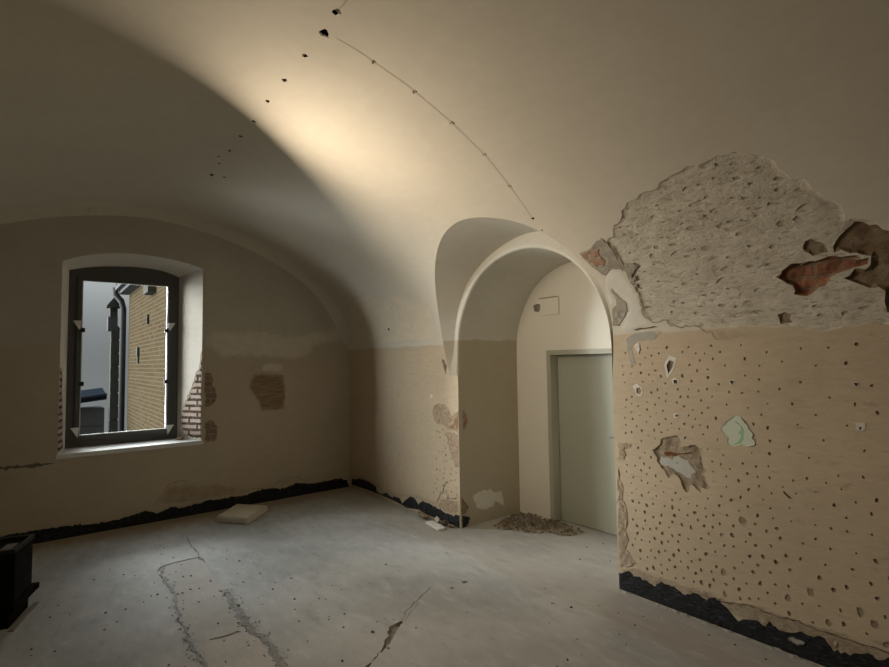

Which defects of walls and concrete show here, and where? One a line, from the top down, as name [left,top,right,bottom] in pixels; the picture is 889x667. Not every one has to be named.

crack [336,38,533,219]
peeling [579,151,889,332]
flaking render [180,351,218,443]
flaking render [248,372,287,412]
crack [0,461,55,472]
flaking render [148,402,469,515]
flaking render [616,345,889,660]